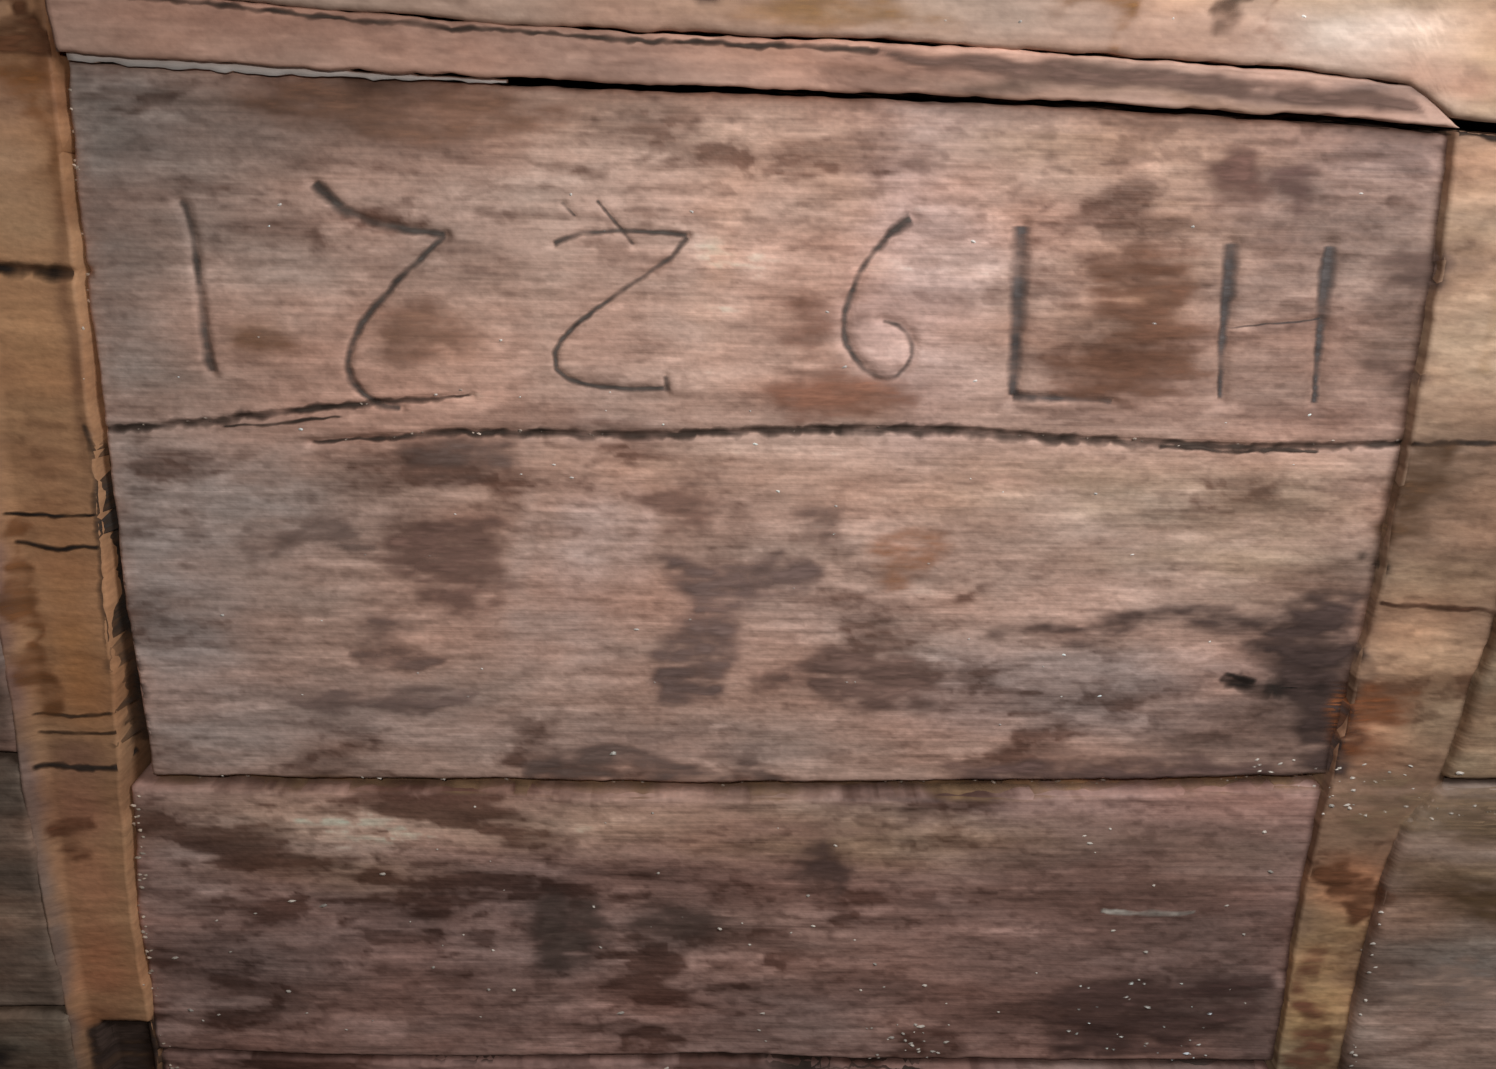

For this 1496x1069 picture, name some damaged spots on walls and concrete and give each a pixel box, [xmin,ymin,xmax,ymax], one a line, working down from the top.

water stain [1212,149,1306,201]
water stain [1072,251,1198,396]
crack [5,389,1496,771]
water stain [652,557,822,703]
water stain [764,648,940,709]
water stain [967,594,1366,780]
water stain [524,745,704,781]
water stain [536,897,602,966]
water stain [1312,862,1384,925]
water stain [1053,975,1273,1065]
water stain [1286,960,1331,1066]